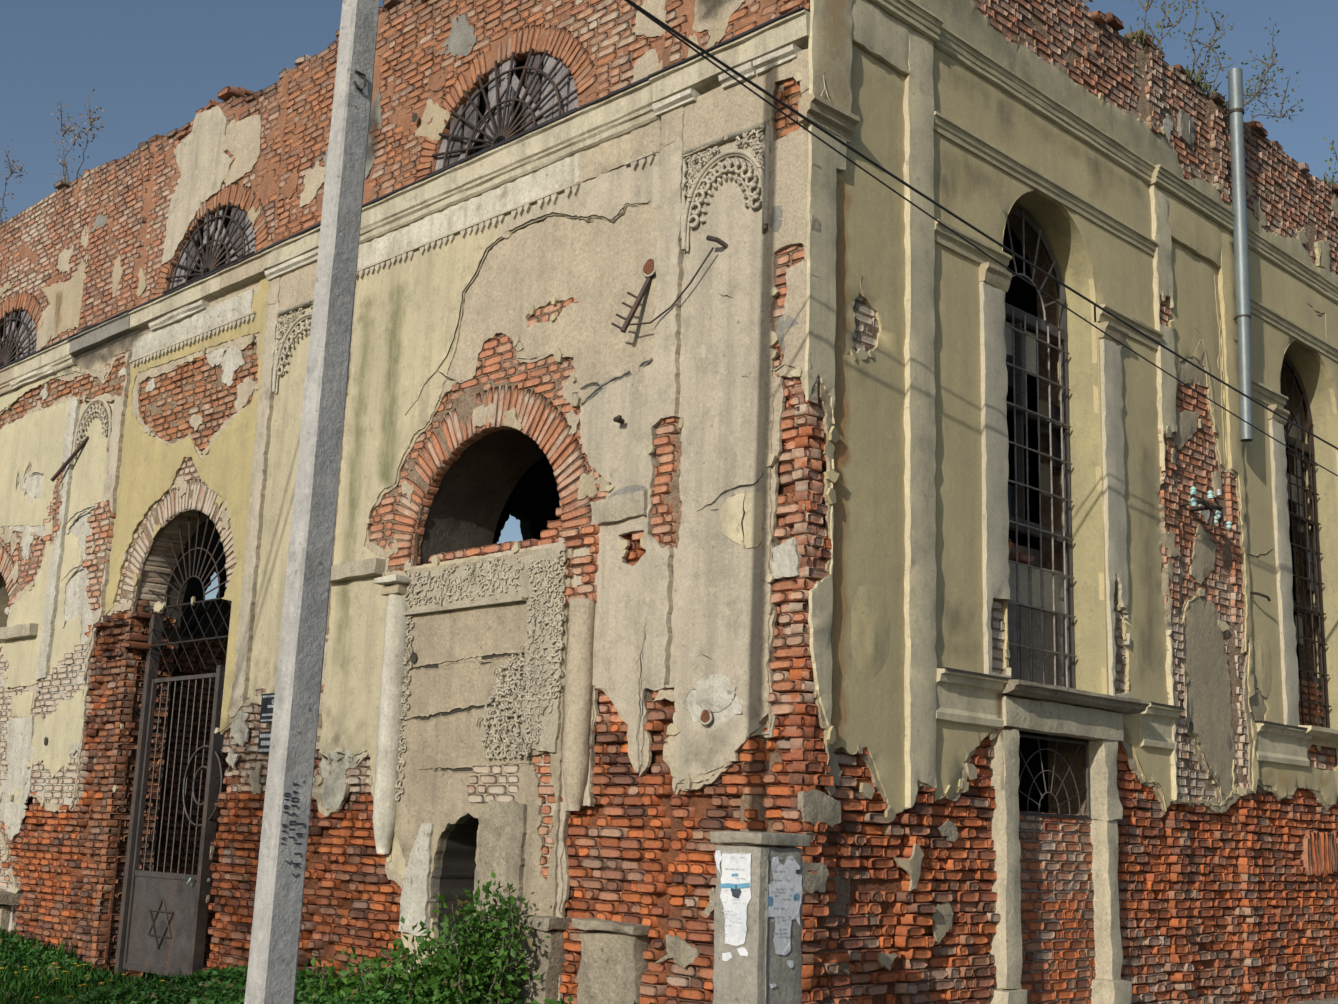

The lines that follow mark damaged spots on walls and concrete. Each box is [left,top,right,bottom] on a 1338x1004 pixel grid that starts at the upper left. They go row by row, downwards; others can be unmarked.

flaking render [0,29,340,351]
flaking render [364,202,658,606]
crack [405,201,653,415]
flaking render [362,0,810,205]
flaking render [0,327,261,974]
flaking render [202,688,272,972]
flaking render [297,634,405,979]
crack [404,703,501,722]
crack [410,651,525,671]
crack [418,761,535,773]
flaking render [530,245,1003,1004]
flaking render [1114,356,1338,1004]